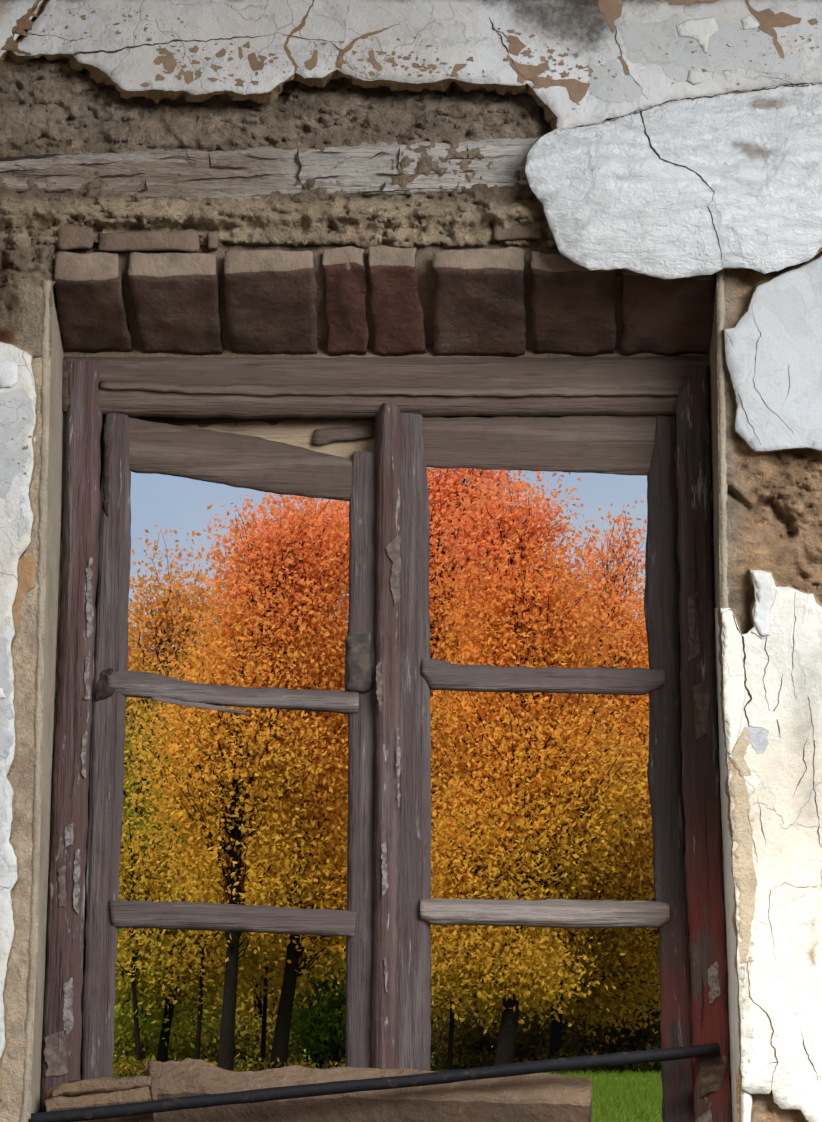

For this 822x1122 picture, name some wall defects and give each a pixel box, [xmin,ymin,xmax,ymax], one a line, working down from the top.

peeling [106,8,290,87]
crack [1,0,400,72]
crack [563,26,822,266]
spalling [0,37,557,1122]
spalling [715,253,822,1122]
crack [725,592,822,960]
crack [747,962,779,1087]